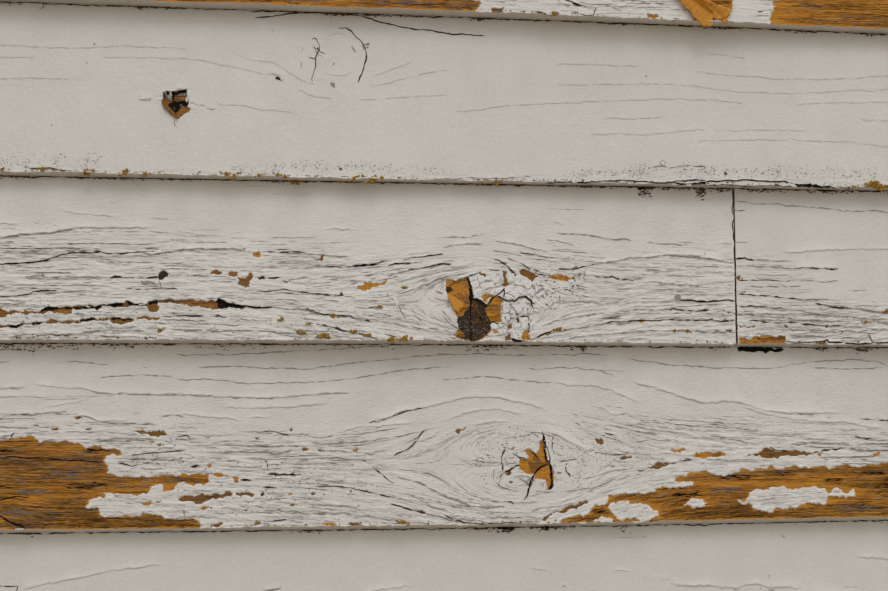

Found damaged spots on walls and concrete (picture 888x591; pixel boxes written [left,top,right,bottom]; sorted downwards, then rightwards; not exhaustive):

peeling [155,0,481,12]
peeling [710,0,733,24]
peeling [770,0,888,29]
peeling [162,90,188,119]
peeling [211,270,265,288]
peeling [357,281,387,291]
peeling [0,298,246,332]
peeling [446,267,578,341]
crack [0,218,888,528]
peeling [0,425,264,530]
peeling [505,440,554,490]
peeling [541,448,888,523]